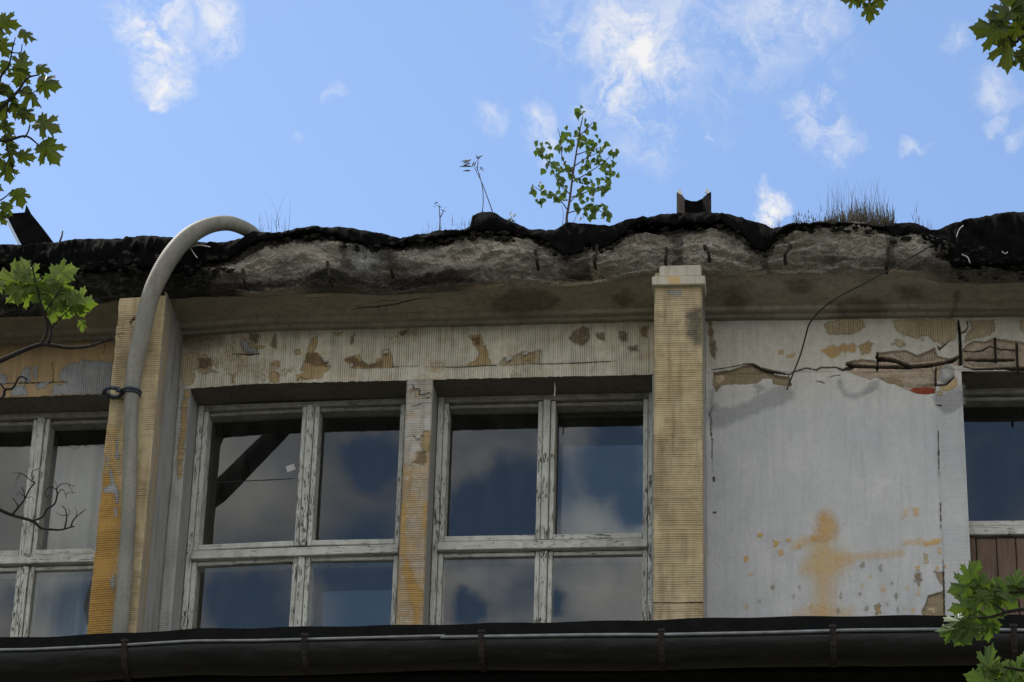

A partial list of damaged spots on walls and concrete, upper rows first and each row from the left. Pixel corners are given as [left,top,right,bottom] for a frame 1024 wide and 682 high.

spalling [202,240,381,286]
spalling [397,236,560,286]
spalling [588,224,934,281]
peeling [0,359,113,396]
peeling [237,334,280,383]
peeling [294,337,331,381]
peeling [335,332,394,369]
peeling [468,335,541,366]
peeling [569,326,605,345]
flaking render [713,365,791,392]
crack [713,321,1024,406]
flaking render [822,318,1024,395]